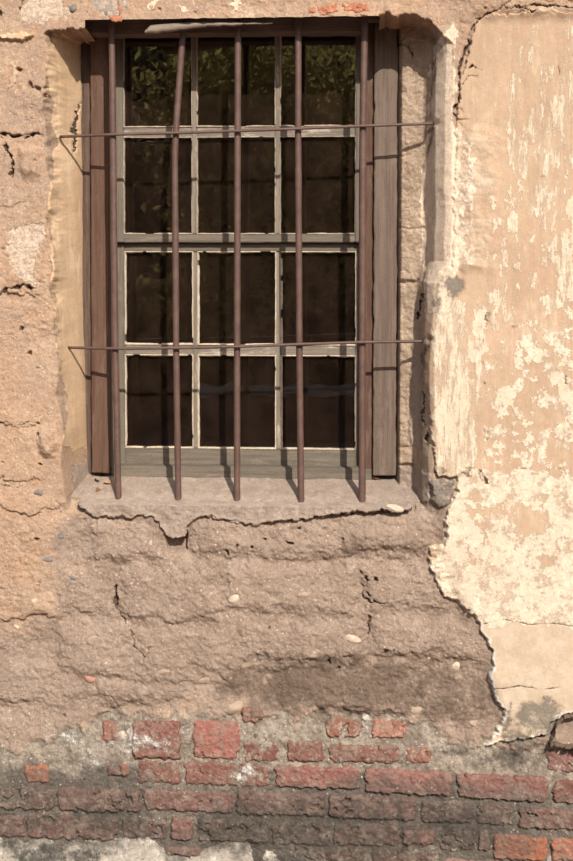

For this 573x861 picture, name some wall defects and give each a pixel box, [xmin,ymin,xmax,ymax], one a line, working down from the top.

crack [453,0,568,117]
crack [1,132,40,178]
crack [70,101,82,152]
spalling [67,20,573,717]
crack [420,390,429,442]
crack [113,585,151,657]
crack [361,572,381,634]
spalling [548,713,573,749]